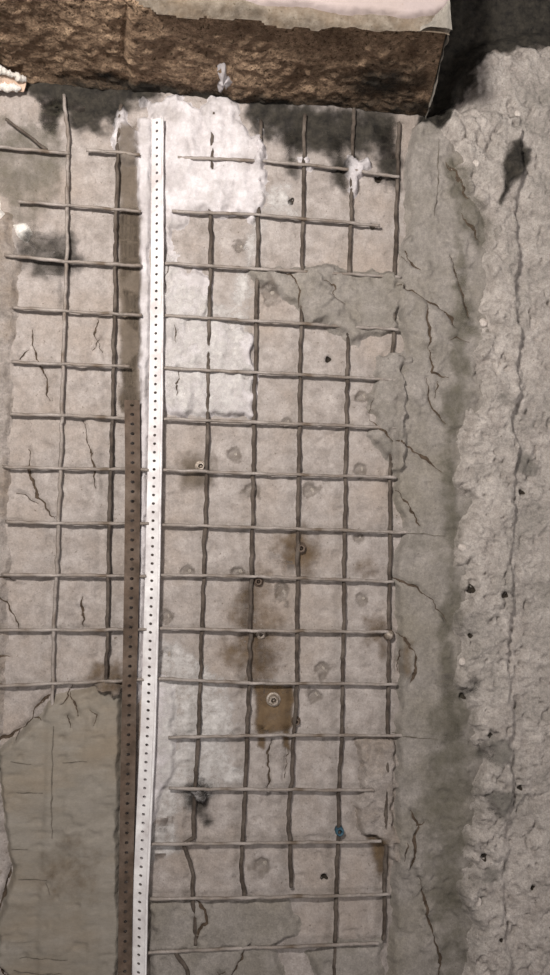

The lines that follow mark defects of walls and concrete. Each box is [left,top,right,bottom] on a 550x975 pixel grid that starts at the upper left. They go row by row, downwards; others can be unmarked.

leakage [418,0,550,128]
leakage [332,137,349,189]
leakage [499,139,531,204]
peeling [13,223,32,243]
leakage [20,232,80,275]
crack [399,251,469,424]
crack [16,449,55,519]
spalling [227,447,241,461]
crack [0,685,97,741]
rust [227,620,294,749]
spalling [315,662,330,680]
crack [404,810,442,975]